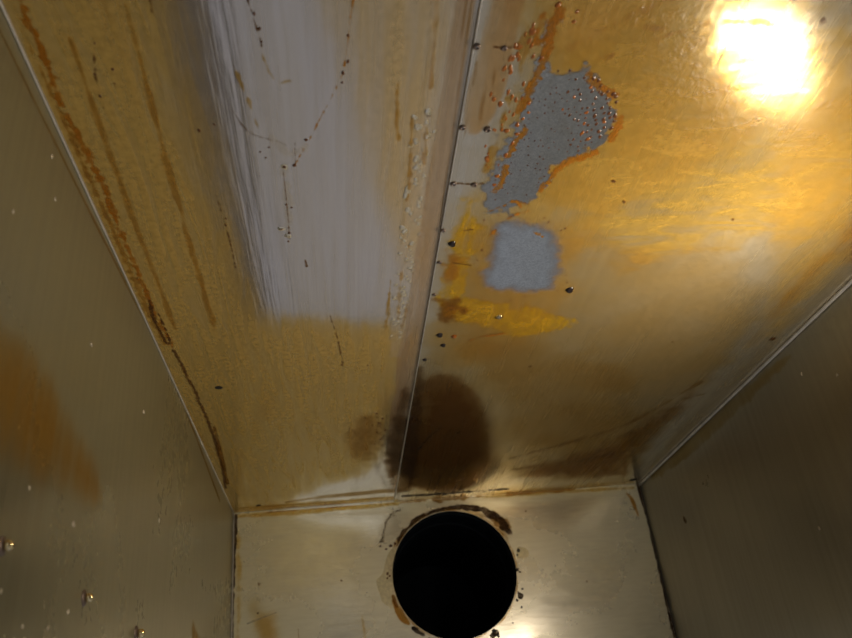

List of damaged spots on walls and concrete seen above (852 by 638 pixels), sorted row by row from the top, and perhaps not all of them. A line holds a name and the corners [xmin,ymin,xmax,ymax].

peeling [473,1,622,301]